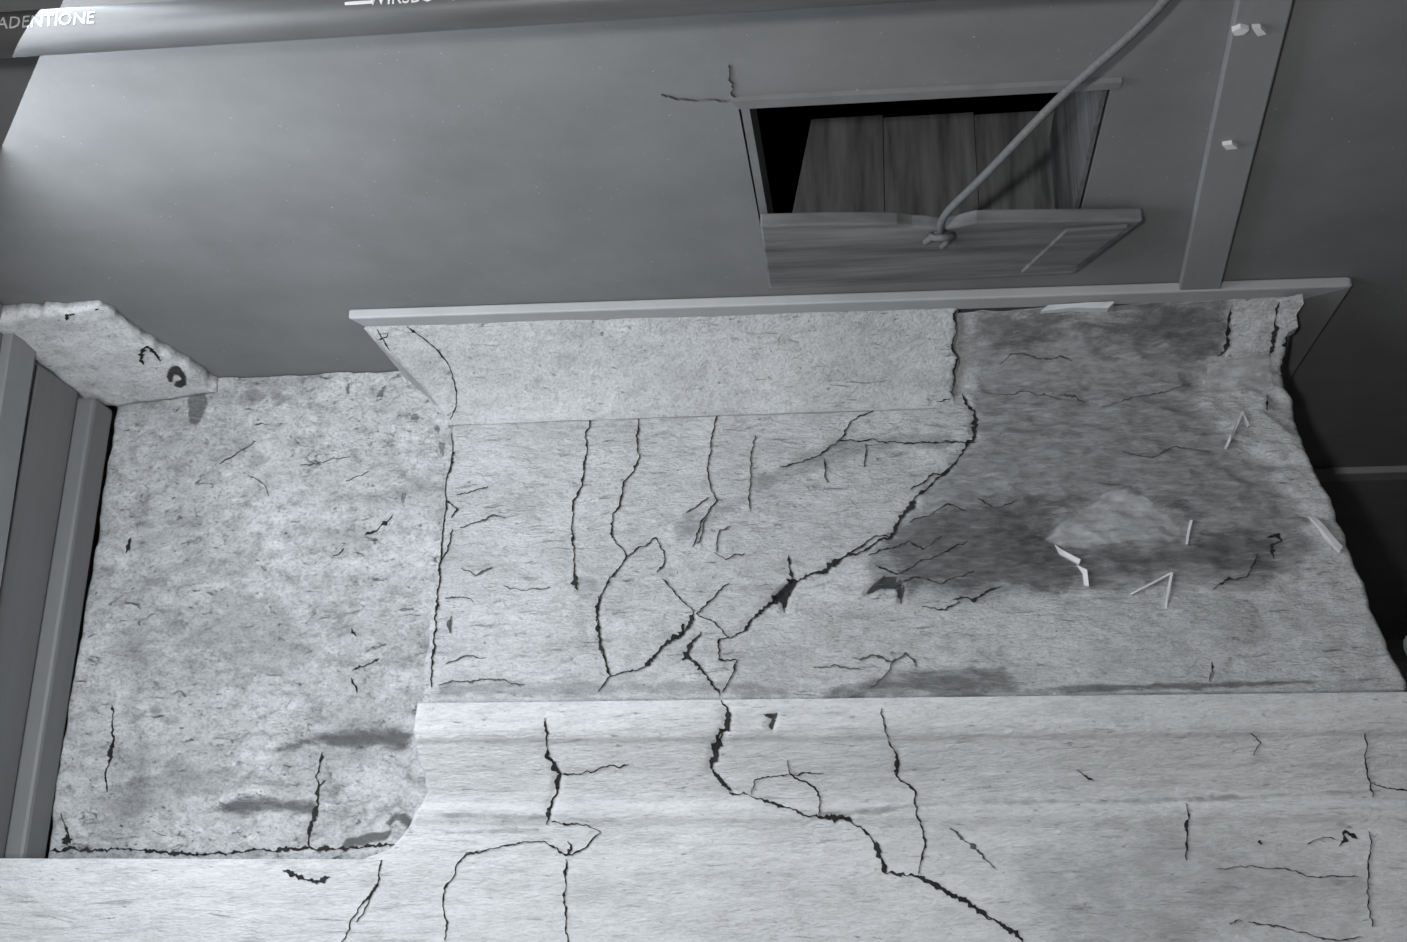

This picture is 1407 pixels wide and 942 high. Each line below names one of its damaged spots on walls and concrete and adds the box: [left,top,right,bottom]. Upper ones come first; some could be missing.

damp [1084,303,1224,359]
crack [1218,305,1233,356]
crack [1266,302,1288,410]
crack [1122,446,1209,458]
damp [987,496,1275,576]
crack [1213,533,1282,590]
crack [377,310,1190,942]
damp [278,730,412,751]
crack [1364,734,1407,797]
damp [221,799,316,813]
damp [343,813,412,847]
crack [1184,804,1373,941]